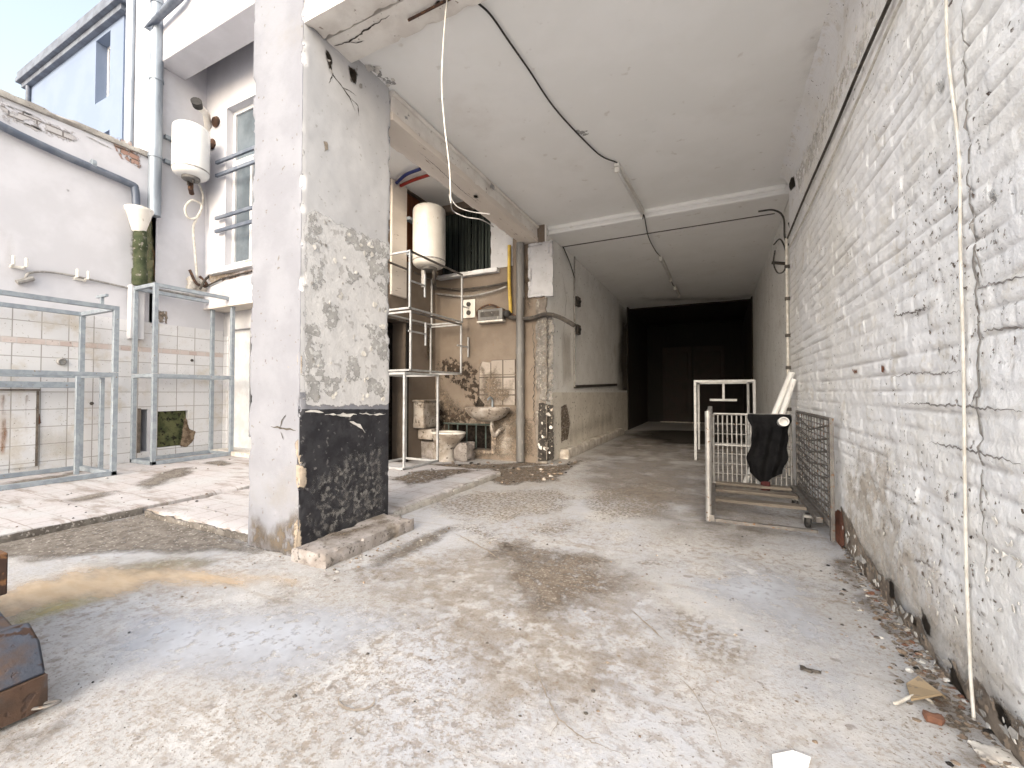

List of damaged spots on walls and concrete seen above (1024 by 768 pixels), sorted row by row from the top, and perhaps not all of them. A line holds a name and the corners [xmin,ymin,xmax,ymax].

crack [329,17,387,113]
peeling [0,104,77,141]
flaking render [114,139,141,168]
peeling [288,211,390,432]
crack [961,0,988,580]
spalling [536,317,570,461]
spalling [295,440,307,488]
spalling [293,519,302,548]